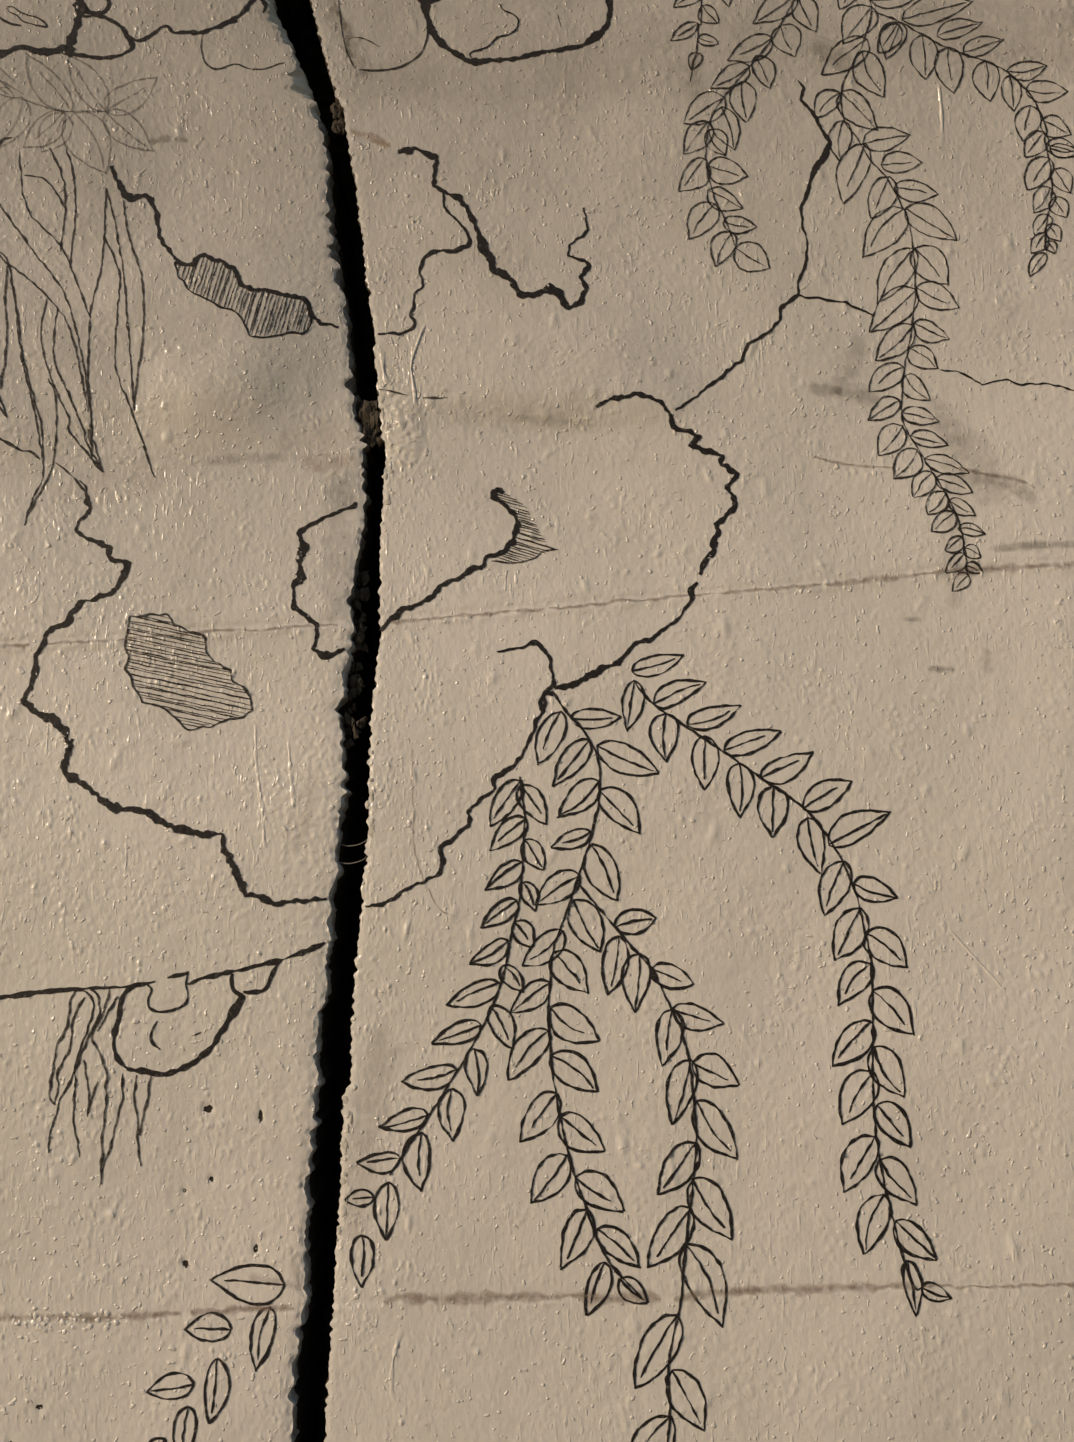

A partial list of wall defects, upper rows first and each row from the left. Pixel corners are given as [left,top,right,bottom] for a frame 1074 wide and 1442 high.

crack [940,369,1074,391]
crack [837,565,1043,590]
crack [16,0,873,1442]